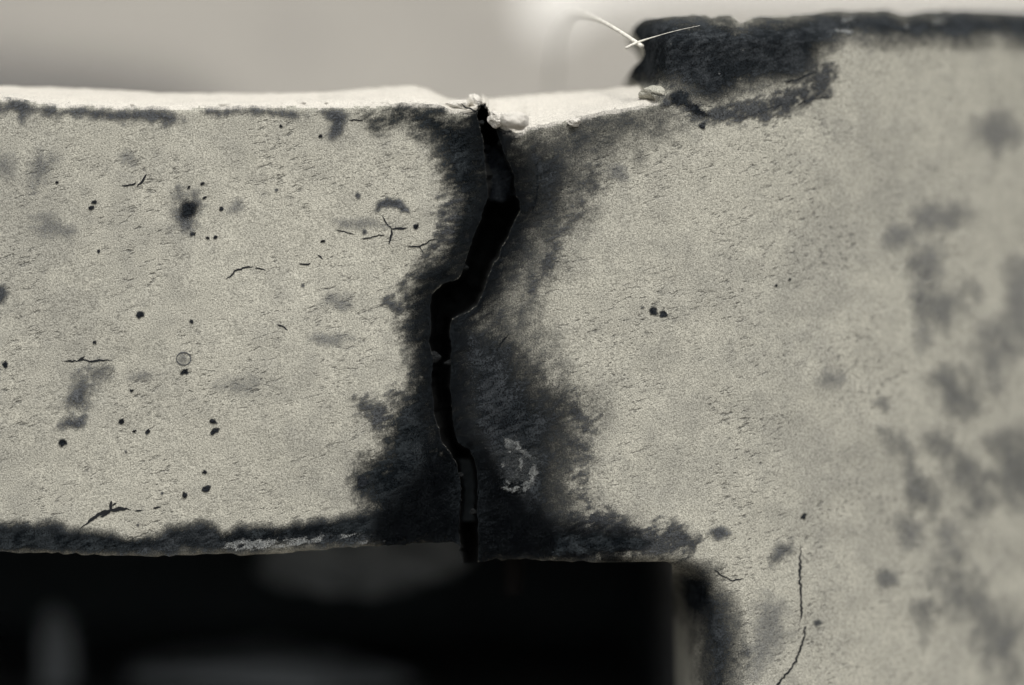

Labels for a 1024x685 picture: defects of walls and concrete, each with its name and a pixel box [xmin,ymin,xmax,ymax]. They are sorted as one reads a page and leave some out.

damp [0,68,185,126]
damp [205,105,299,119]
damp [628,9,1024,106]
damp [225,102,673,562]
crack [429,103,536,563]
damp [0,526,152,553]
damp [672,559,749,685]
crack [776,545,806,685]